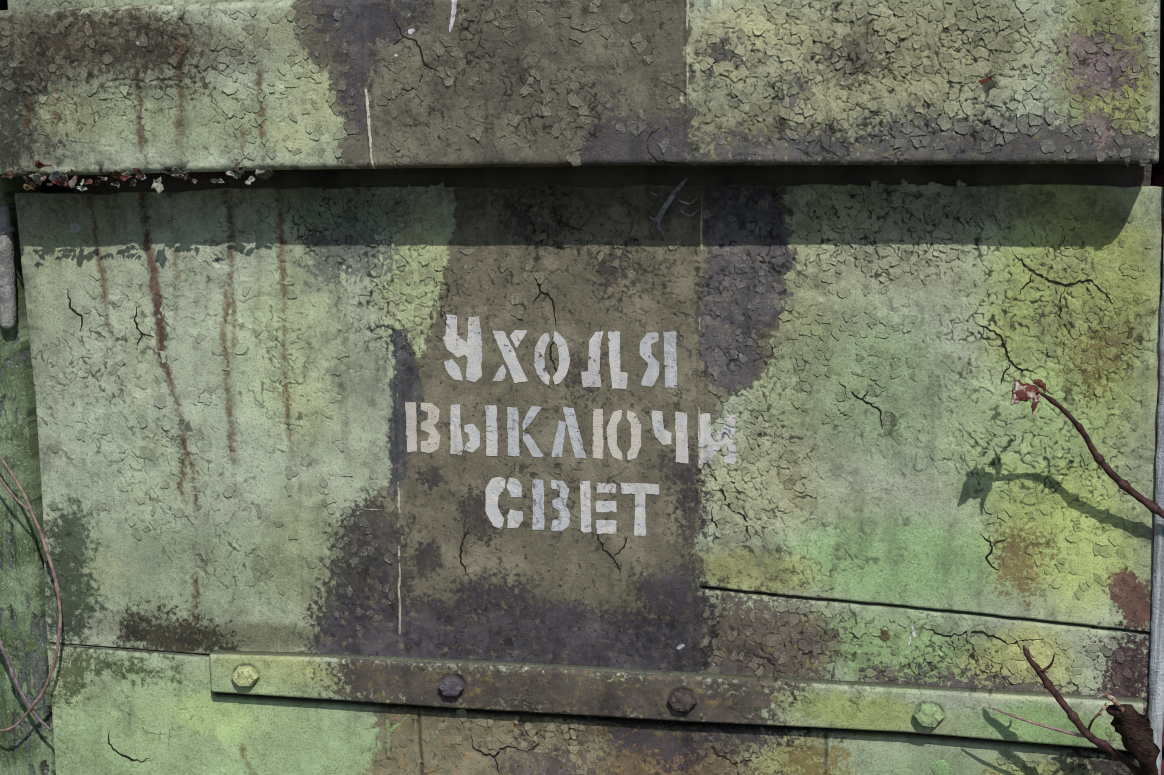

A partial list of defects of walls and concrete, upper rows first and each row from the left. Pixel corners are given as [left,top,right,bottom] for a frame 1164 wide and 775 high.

peeling [1,160,198,194]
rust [0,4,230,177]
peeling [39,0,1160,185]
rust [139,193,178,402]
rust [221,188,236,380]
peeling [244,178,982,678]
crack [977,323,1038,384]
crack [1012,250,1113,335]
damp [43,495,186,712]
crack [922,626,1043,650]
peeling [924,623,1132,695]
crack [108,734,148,762]